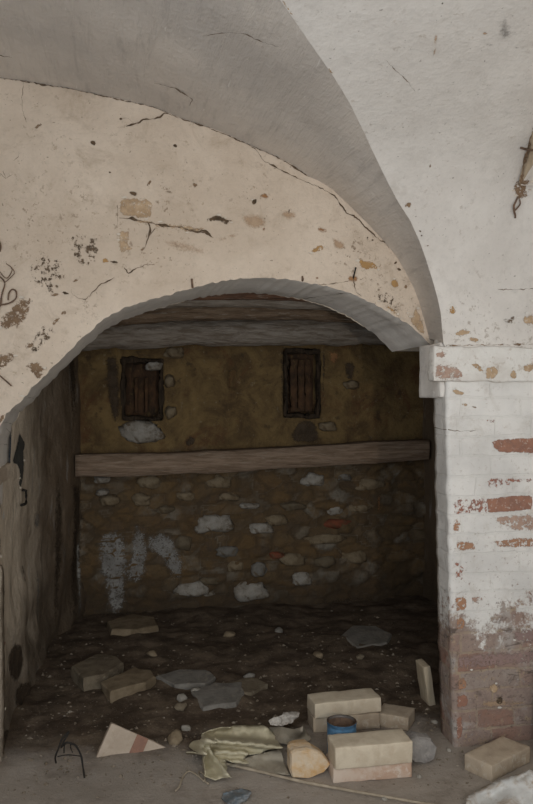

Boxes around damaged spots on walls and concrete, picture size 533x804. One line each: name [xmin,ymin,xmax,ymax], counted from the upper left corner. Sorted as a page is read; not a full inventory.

crack [2,78,389,248]
flaking render [31,257,69,296]
flaking render [71,236,118,265]
crack [71,206,213,300]
flaking render [377,261,424,333]
peeling [431,352,476,408]
peeling [472,364,498,379]
flaking render [13,435,25,489]
peeling [492,438,533,455]
peeling [453,476,533,547]
spalling [456,597,482,630]
water stain [8,644,31,707]